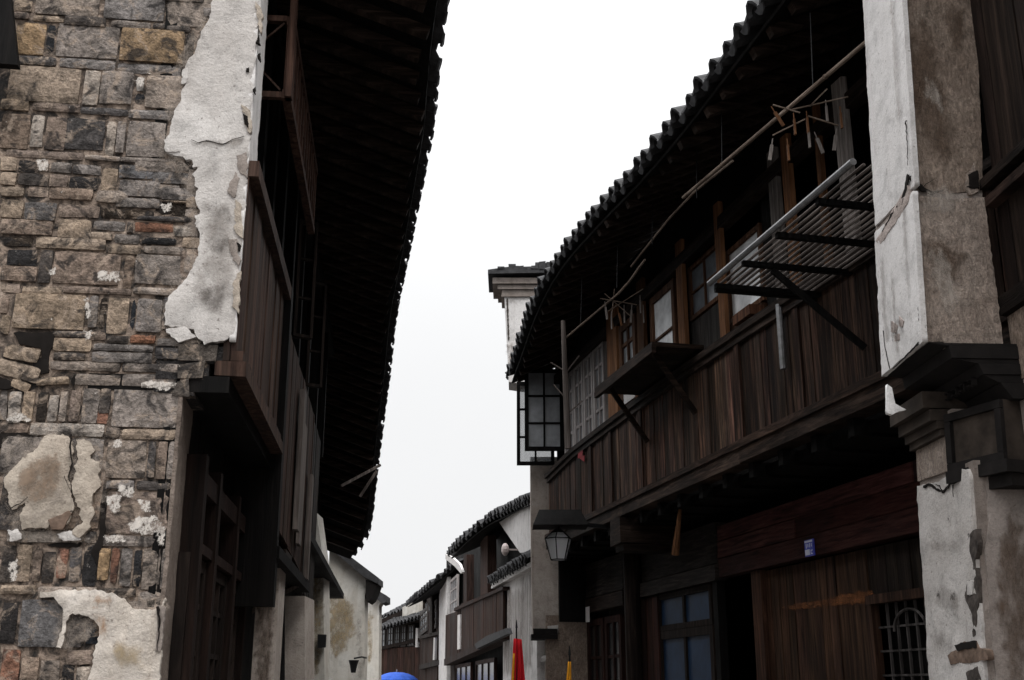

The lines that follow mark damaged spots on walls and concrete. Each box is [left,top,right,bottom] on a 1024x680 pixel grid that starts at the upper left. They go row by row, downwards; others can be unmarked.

flaking render [164,0,264,345]
crack [191,136,244,145]
spalling [876,185,913,244]
peeling [98,270,120,282]
peeling [144,380,174,391]
crack [64,434,74,502]
flaking render [48,439,166,545]
flaking render [7,529,22,542]
flaking render [40,589,166,680]
damp [313,578,354,671]
spalling [947,529,994,680]